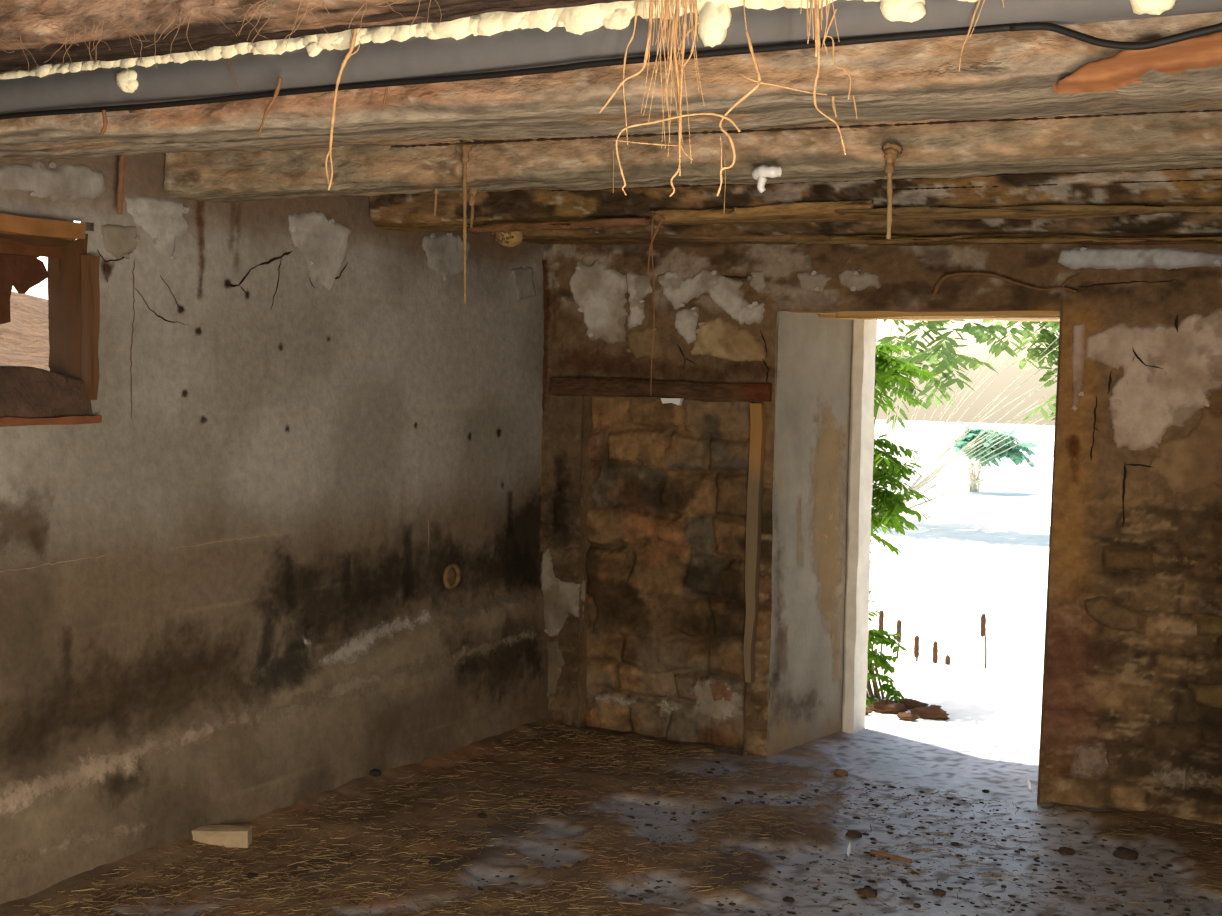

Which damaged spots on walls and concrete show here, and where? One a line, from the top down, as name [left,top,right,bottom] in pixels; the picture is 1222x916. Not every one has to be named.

peeling [0,160,106,203]
crack [97,250,183,419]
peeling [93,196,189,278]
crack [230,251,293,310]
peeling [288,211,351,290]
peeling [422,233,471,281]
flaking render [569,260,766,362]
crack [1090,347,1163,462]
flaking render [1071,308,1222,451]
crack [1122,464,1151,527]
damp [0,485,569,813]
flaking render [541,549,585,697]